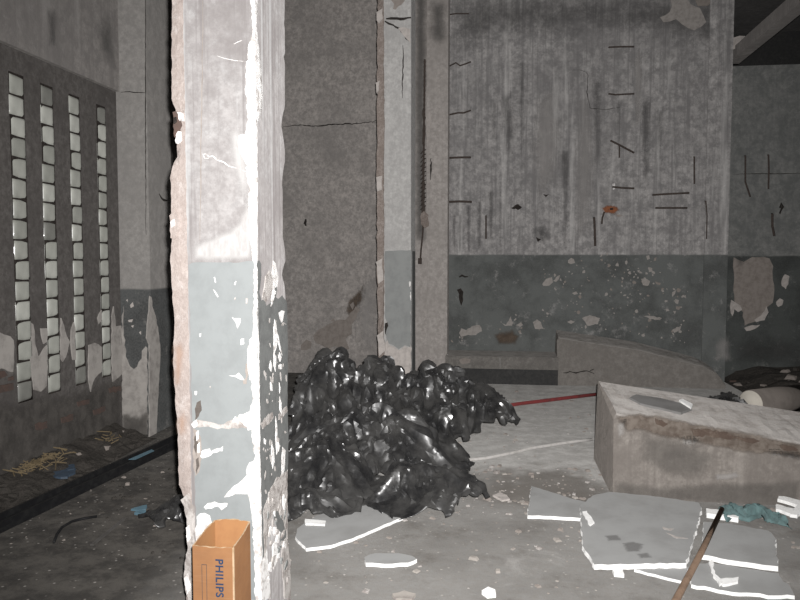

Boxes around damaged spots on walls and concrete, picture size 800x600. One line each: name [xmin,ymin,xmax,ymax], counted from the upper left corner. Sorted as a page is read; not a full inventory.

peeling [660,0,710,30]
crack [385,17,411,98]
crack [284,119,377,127]
peeling [181,0,291,600]
peeling [542,258,607,330]
peeling [600,252,688,337]
peeling [730,257,789,331]
peeling [0,333,14,393]
peeling [30,323,48,392]
peeling [60,318,76,362]
peeling [88,296,161,437]